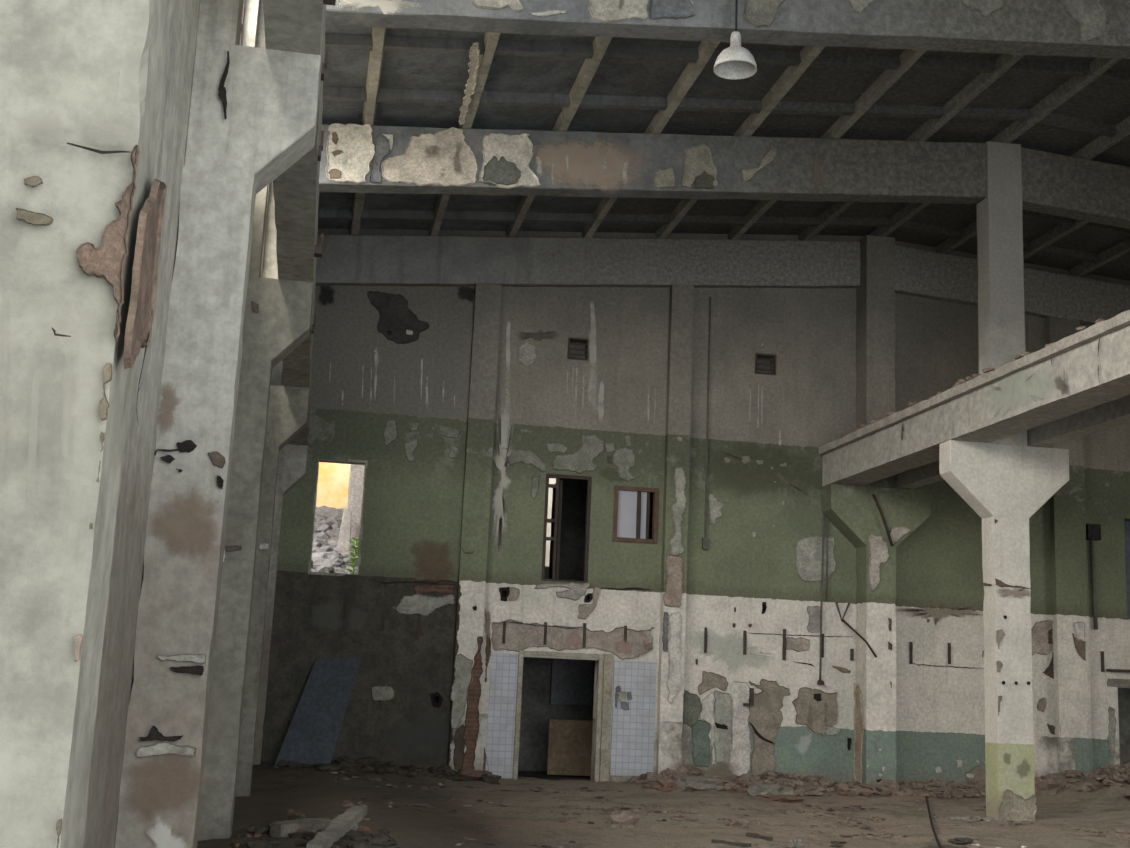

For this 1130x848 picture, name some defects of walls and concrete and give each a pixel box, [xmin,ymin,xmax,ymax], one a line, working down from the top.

peeling [588,0,695,23]
peeling [326,42,540,189]
spalling [367,291,429,344]
spalling [160,440,226,502]
peeling [502,434,636,499]
peeling [430,467,885,783]
spalling [996,629,1005,672]
peeling [1031,620,1054,679]
spalling [1037,698,1061,735]